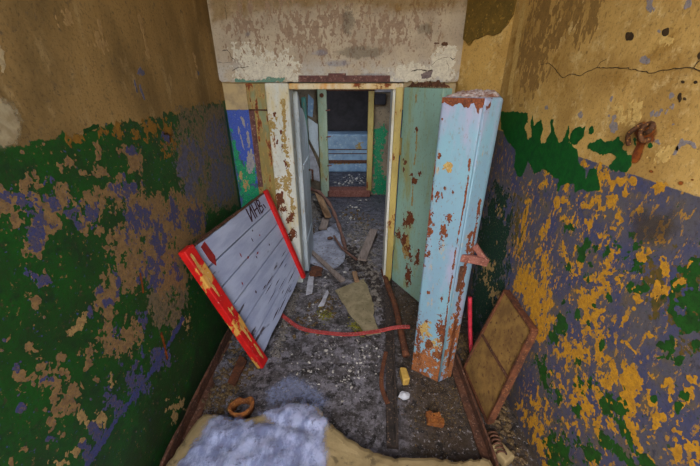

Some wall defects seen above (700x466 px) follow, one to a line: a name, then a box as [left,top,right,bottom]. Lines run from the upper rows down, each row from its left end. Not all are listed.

peeling [220,0,517,82]
crack [541,59,700,78]
corrosion [268,98,298,241]
corrosion [631,122,657,163]
peeling [0,100,259,372]
peeling [467,0,700,466]
peeling [12,341,125,466]
peeling [165,397,187,425]